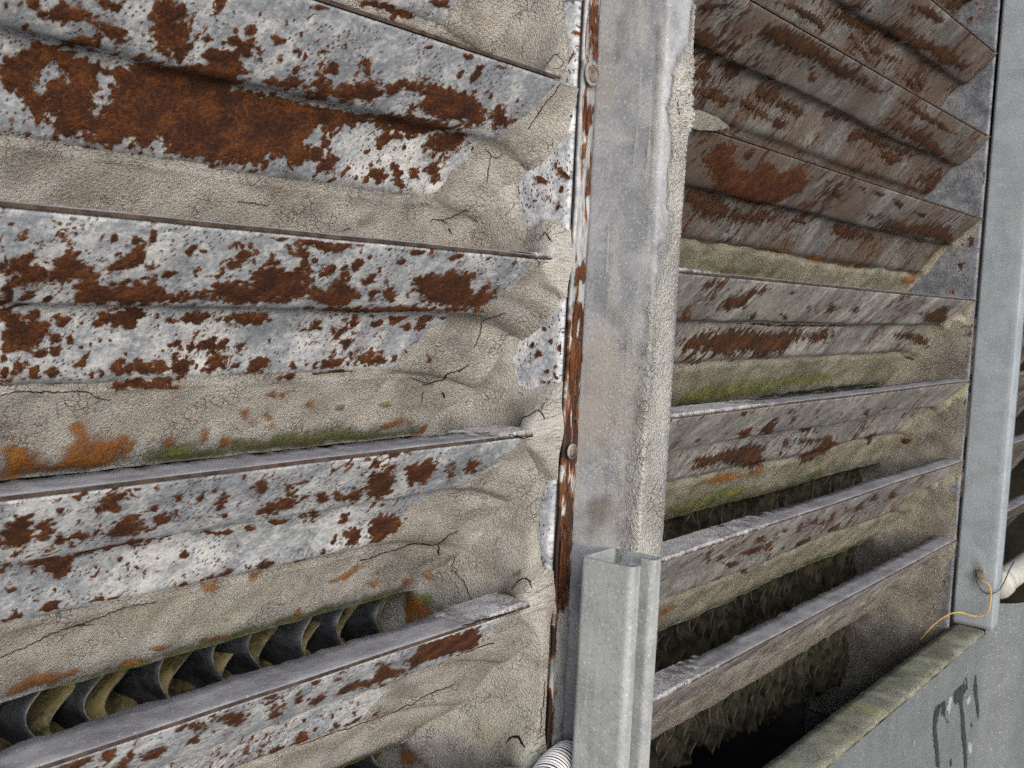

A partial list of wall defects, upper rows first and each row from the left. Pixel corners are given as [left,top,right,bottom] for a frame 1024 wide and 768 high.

corrosion [0,0,519,190]
crack [528,53,564,129]
corrosion [693,0,973,194]
crack [513,231,552,267]
corrosion [0,229,499,398]
crack [411,313,506,402]
corrosion [676,282,860,359]
water stain [751,382,884,400]
corrosion [0,488,183,612]
corrosion [196,454,482,555]
crack [360,530,533,656]
corrosion [259,626,486,754]